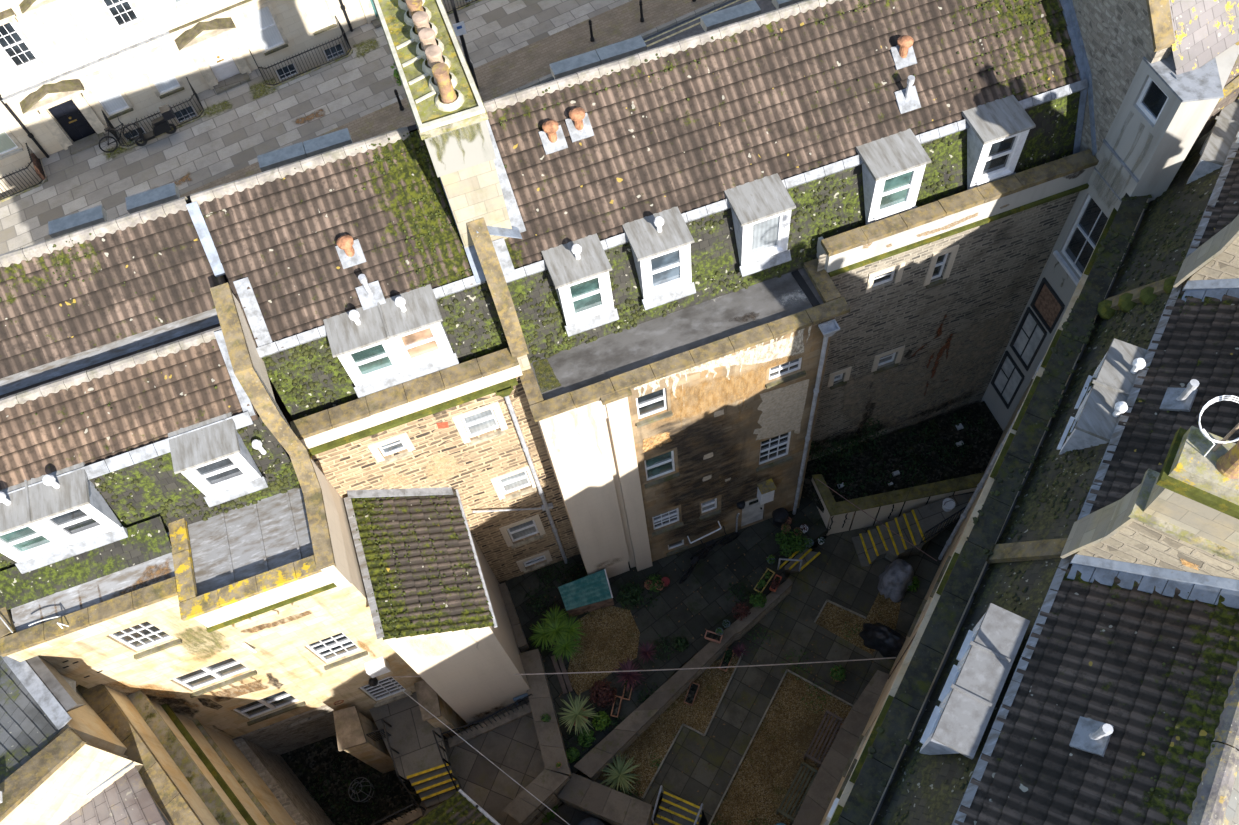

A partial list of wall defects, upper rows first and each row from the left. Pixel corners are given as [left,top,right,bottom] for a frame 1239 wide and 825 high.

peeling [634,322,821,397]
water stain [113,673,283,710]